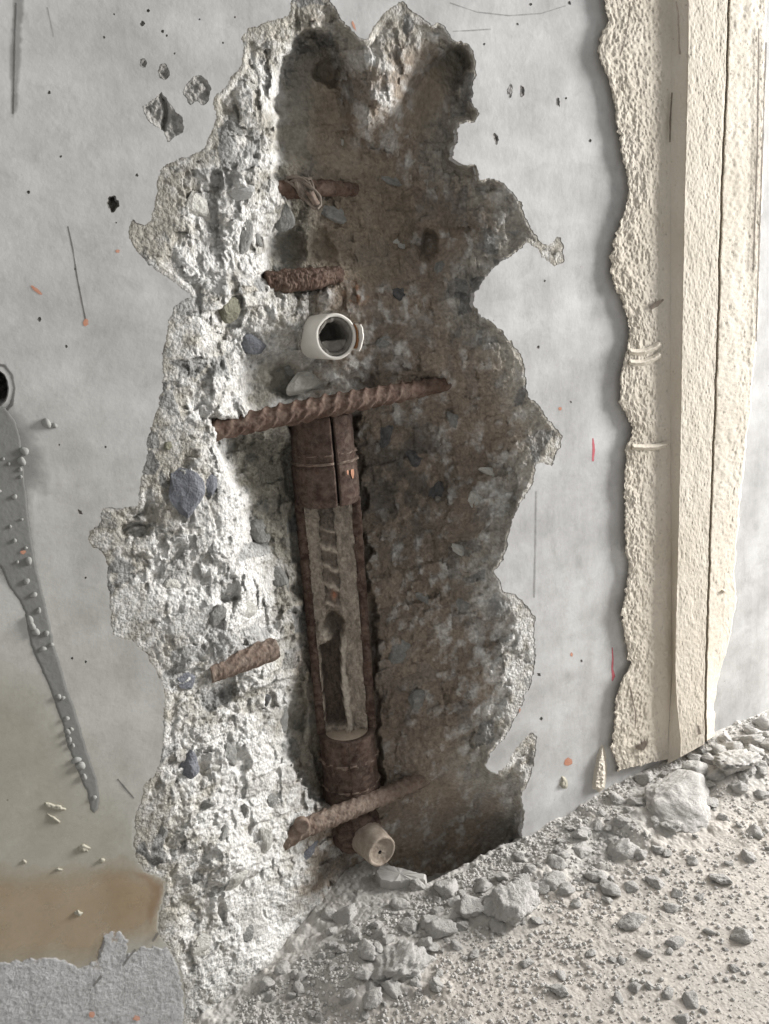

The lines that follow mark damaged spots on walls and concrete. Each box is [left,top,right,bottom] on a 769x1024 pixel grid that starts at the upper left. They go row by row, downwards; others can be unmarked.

damp [0,878,150,950]
spalling [88,0,564,1024]